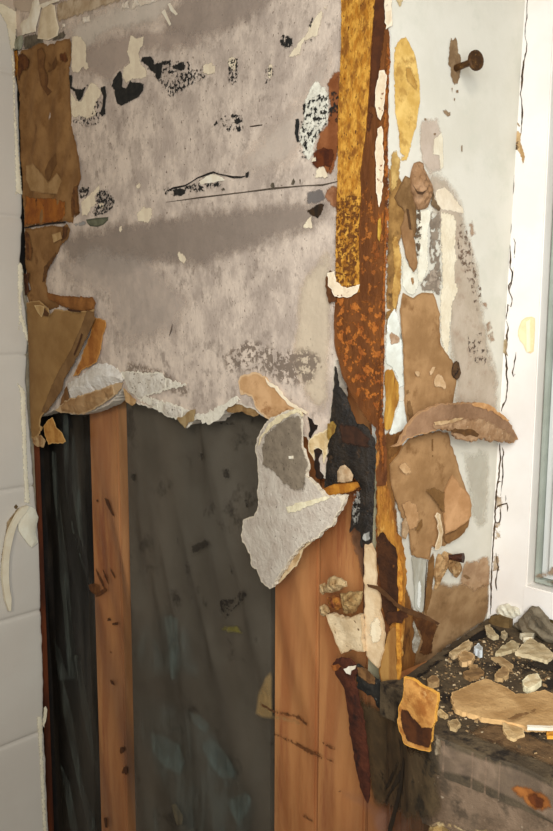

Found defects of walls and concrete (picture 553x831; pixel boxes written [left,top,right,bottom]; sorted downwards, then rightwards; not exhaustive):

crack [520,0,528,131]
spalling [295,82,329,178]
rust [312,72,340,174]
water stain [65,205,316,273]
water stain [128,363,187,394]
water stain [226,254,330,405]
rust [325,0,417,672]
peeling [385,309,404,388]
peeling [389,401,407,435]
crack [501,226,516,411]
crack [490,443,508,614]
spalling [485,624,553,664]